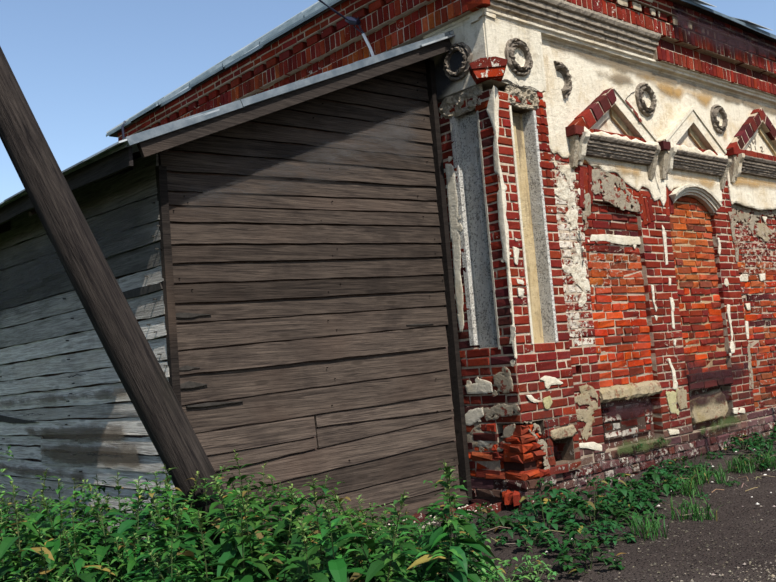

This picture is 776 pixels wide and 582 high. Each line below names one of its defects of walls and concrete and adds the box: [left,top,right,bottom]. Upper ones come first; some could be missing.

flaking render [536,91,641,337]
flaking render [733,216,776,281]
spalling [465,376,563,506]
flaking render [579,416,602,451]